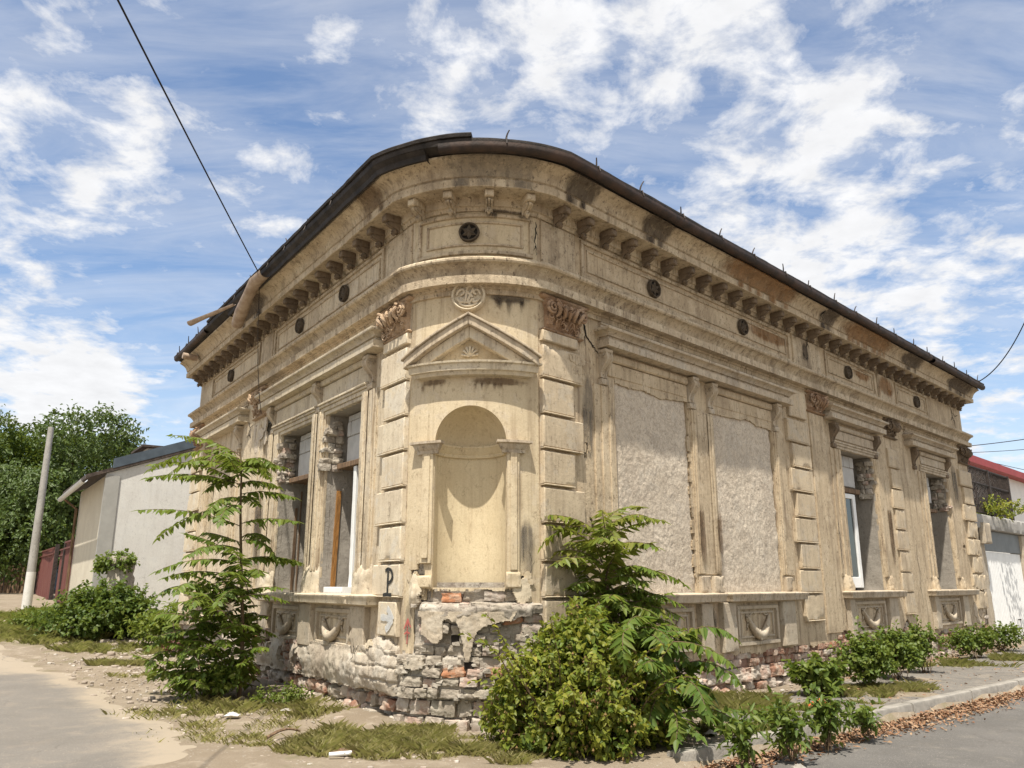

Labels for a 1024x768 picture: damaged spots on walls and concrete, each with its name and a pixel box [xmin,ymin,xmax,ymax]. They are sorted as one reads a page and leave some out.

damp [567,173,601,209]
damp [643,214,674,248]
flaking render [393,557,543,732]
flaking render [674,630,853,695]